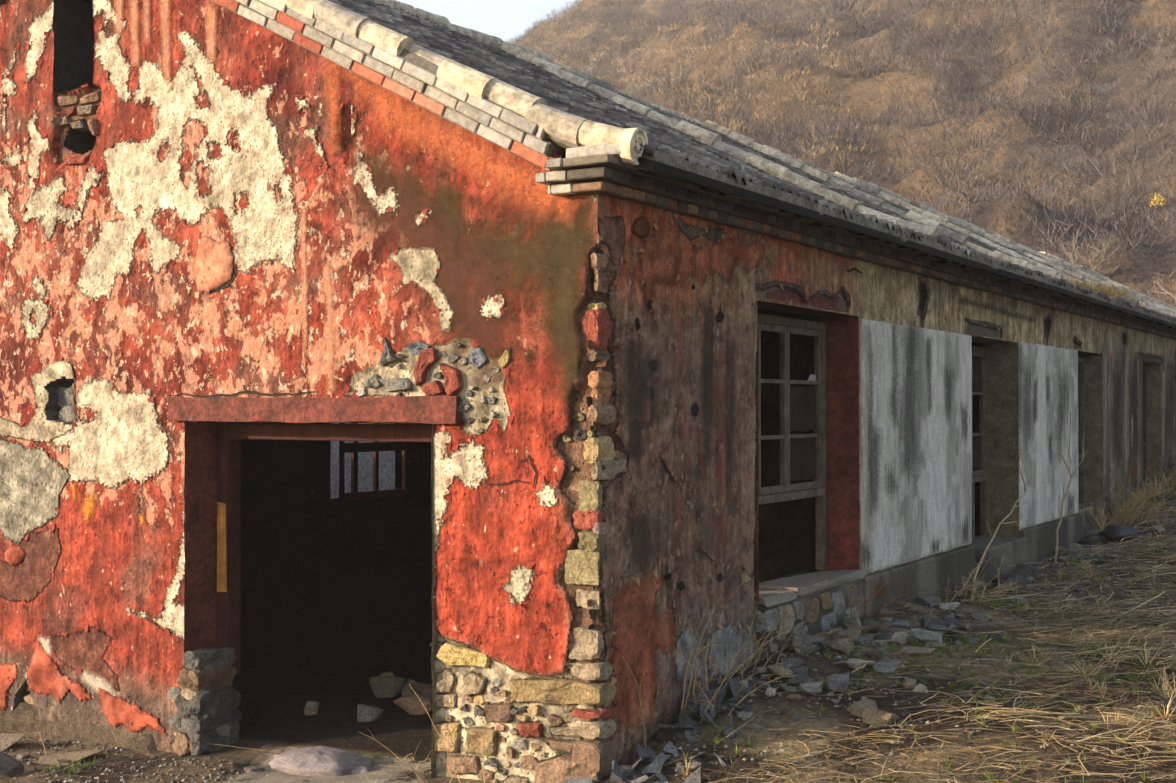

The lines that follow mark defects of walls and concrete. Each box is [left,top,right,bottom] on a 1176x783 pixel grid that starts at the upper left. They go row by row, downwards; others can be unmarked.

peeling [0,0,299,303]
peeling [294,95,400,216]
peeling [413,208,432,227]
damp [325,58,587,406]
peeling [0,357,169,604]
spalling [0,484,242,756]
spalling [343,247,514,600]
spalling [430,214,755,783]
damp [628,342,658,464]
damp [704,309,734,492]
damp [868,316,968,511]
damp [1019,345,1069,465]